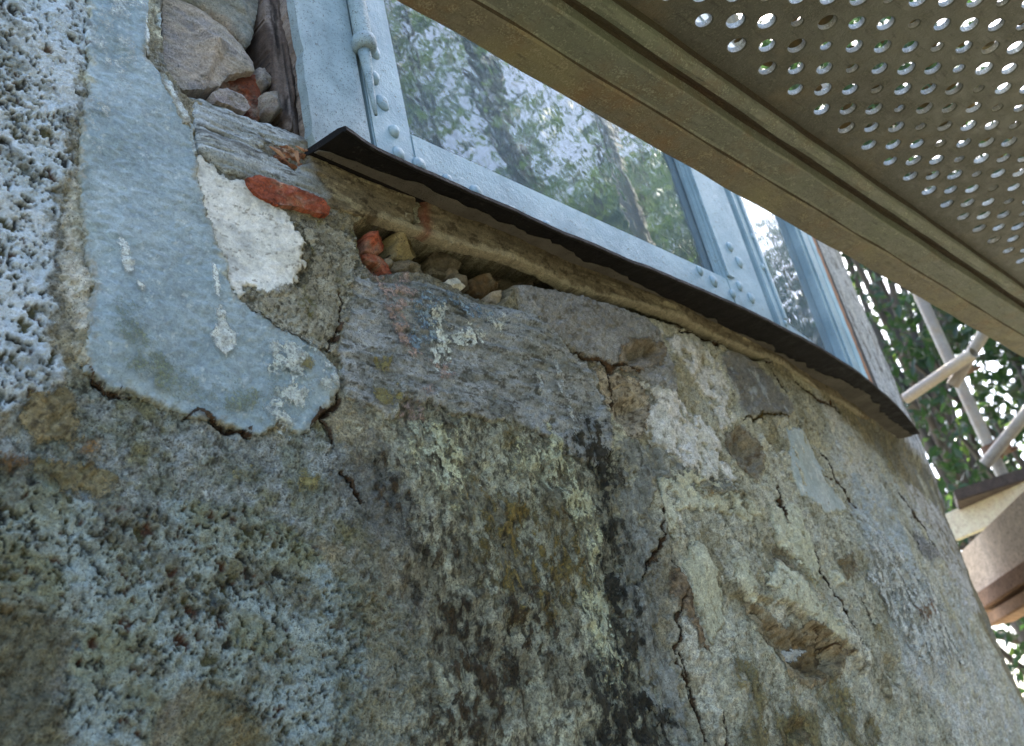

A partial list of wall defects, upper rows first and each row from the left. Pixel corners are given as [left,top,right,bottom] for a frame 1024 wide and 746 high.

peeling [55,0,366,438]
crack [86,364,131,400]
crack [566,344,640,409]
crack [183,407,252,439]
crack [776,485,789,523]
crack [821,454,856,509]
crack [642,499,673,578]
crack [672,595,728,746]